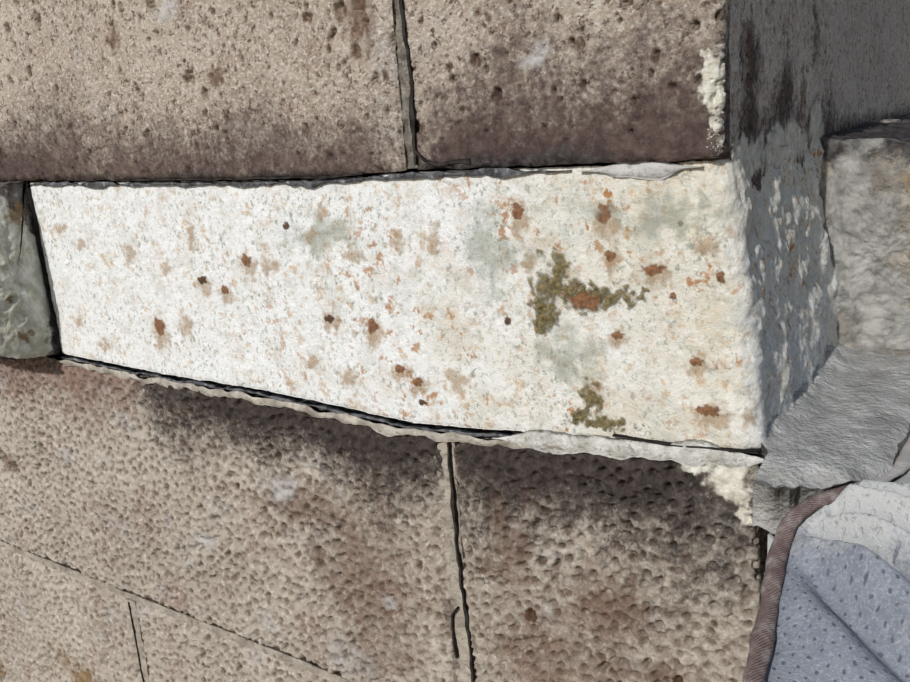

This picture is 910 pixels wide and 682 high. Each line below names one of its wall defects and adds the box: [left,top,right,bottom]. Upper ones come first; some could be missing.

damp [0,100,402,182]
damp [416,10,910,193]
rust [512,203,524,219]
spalling [0,195,54,359]
rust [154,317,165,336]
rust [368,318,379,335]
rust [642,265,666,276]
damp [834,267,910,355]
damp [0,357,442,511]
rust [696,404,719,417]
damp [456,437,760,595]
crack [447,442,476,682]